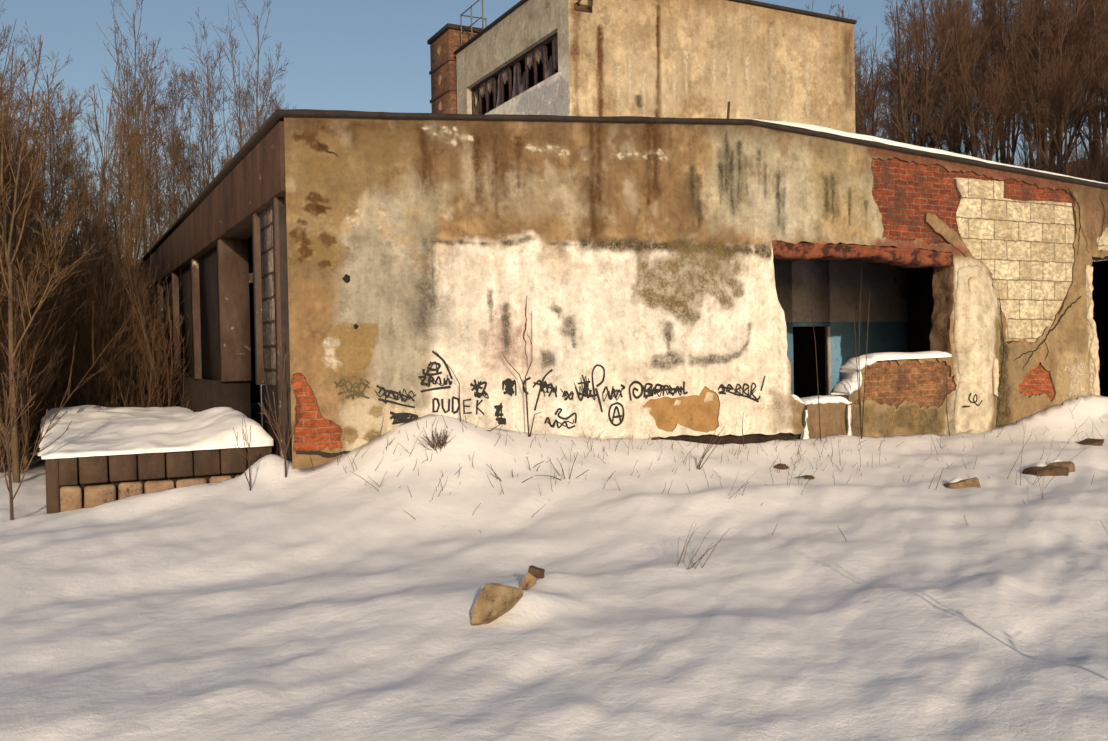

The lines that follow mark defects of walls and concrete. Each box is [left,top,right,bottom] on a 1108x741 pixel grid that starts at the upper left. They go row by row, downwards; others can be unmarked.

flaking render [871,158,1075,245]
spalling [1097,227,1108,251]
spalling [291,373,387,453]
peeling [643,387,719,433]
spalling [1018,364,1054,401]
crack [996,296,1081,427]
spalling [1085,265,1100,396]